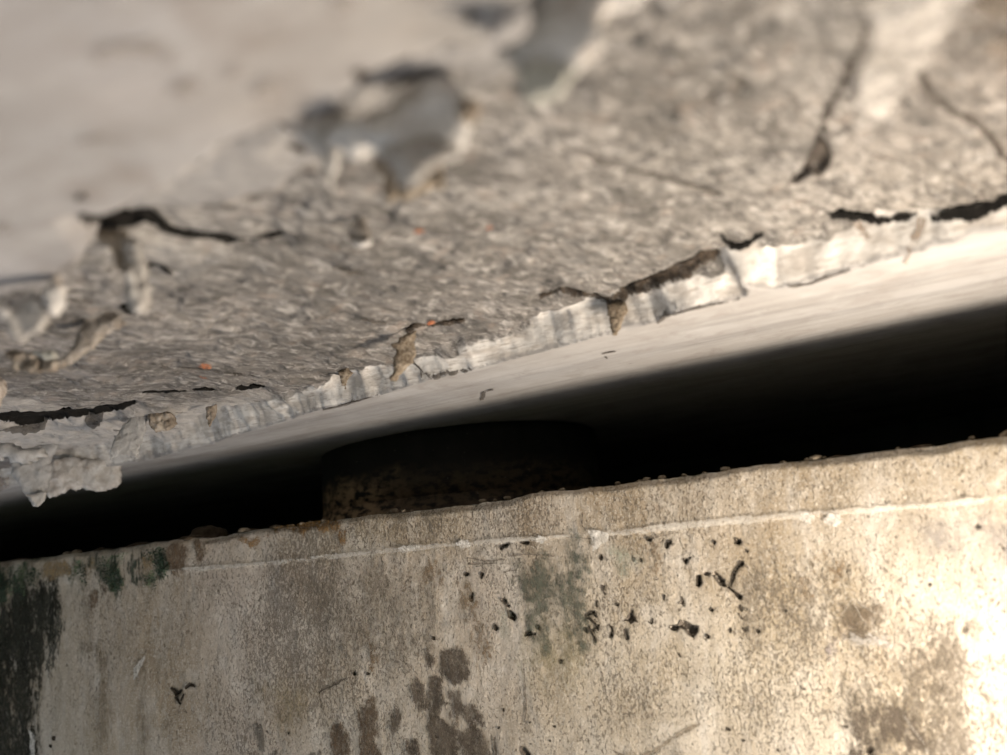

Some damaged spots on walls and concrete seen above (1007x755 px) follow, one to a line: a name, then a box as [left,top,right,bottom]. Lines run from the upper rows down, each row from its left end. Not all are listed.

crack [787,0,872,188]
crack [919,71,1007,161]
spalling [0,0,1007,507]
damp [0,578,61,755]
damp [253,724,277,755]
damp [310,696,401,755]
damp [405,646,491,755]